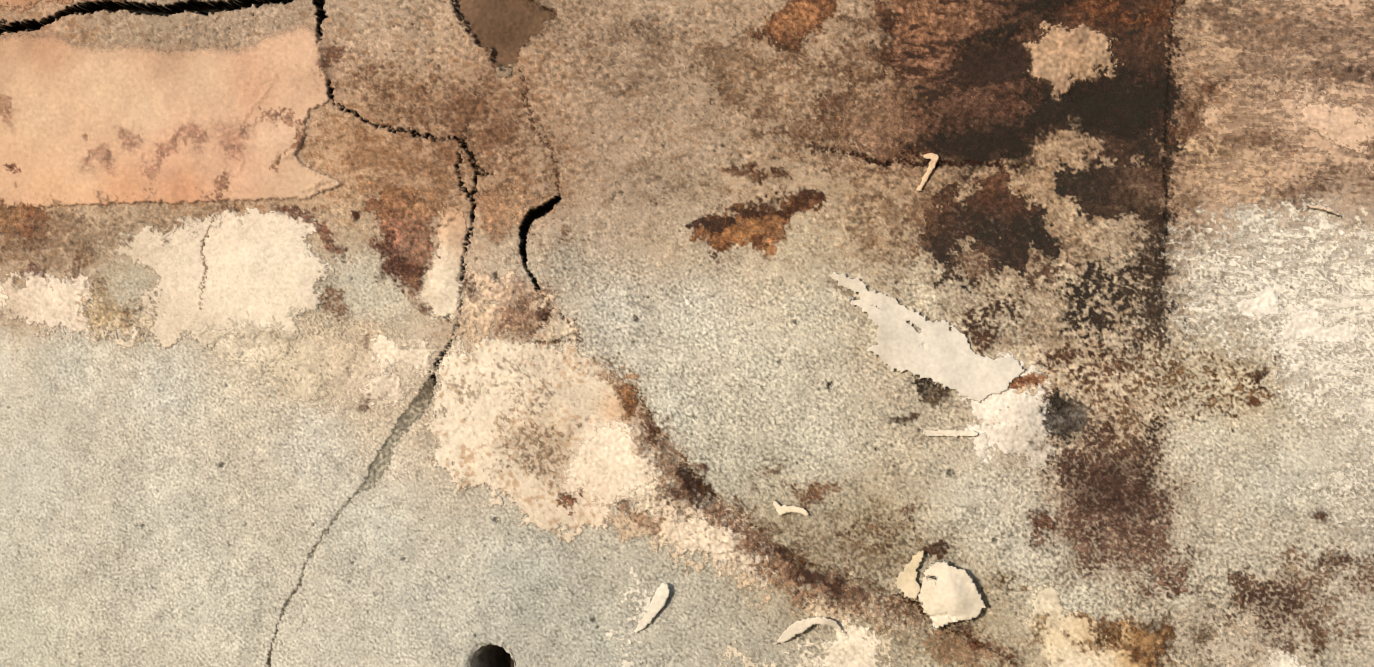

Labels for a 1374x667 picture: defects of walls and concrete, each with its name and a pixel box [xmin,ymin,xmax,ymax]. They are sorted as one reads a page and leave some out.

crack [0,0,327,43]
corrosion [748,0,838,54]
crack [267,81,494,667]
peeling [0,203,989,667]
crack [519,69,581,344]
corrosion [685,161,826,262]
damp [890,374,952,425]
peeling [829,271,1062,474]
damp [685,0,1374,354]
damp [1025,388,1196,598]
peeling [1133,0,1374,554]
peeling [1025,578,1307,667]